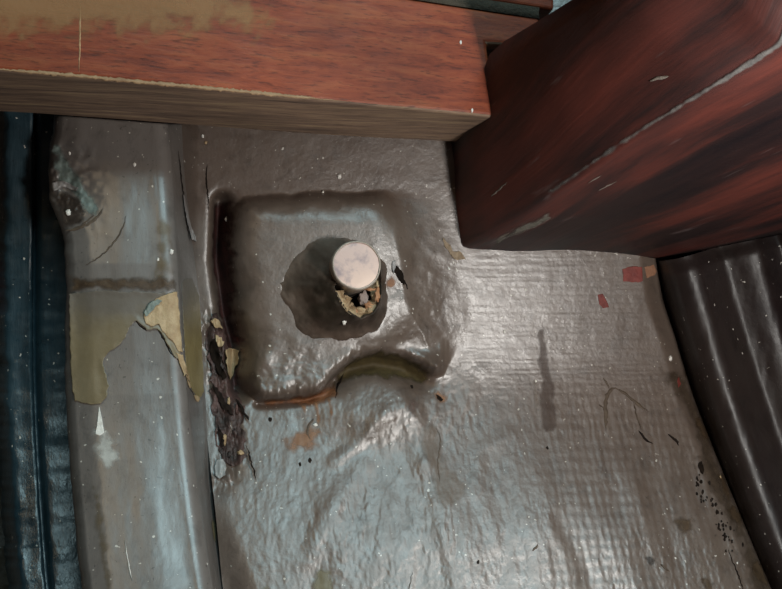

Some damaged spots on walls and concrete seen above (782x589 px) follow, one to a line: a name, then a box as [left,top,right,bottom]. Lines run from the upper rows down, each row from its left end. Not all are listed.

peeling [68,278,239,405]
crack [599,378,679,445]